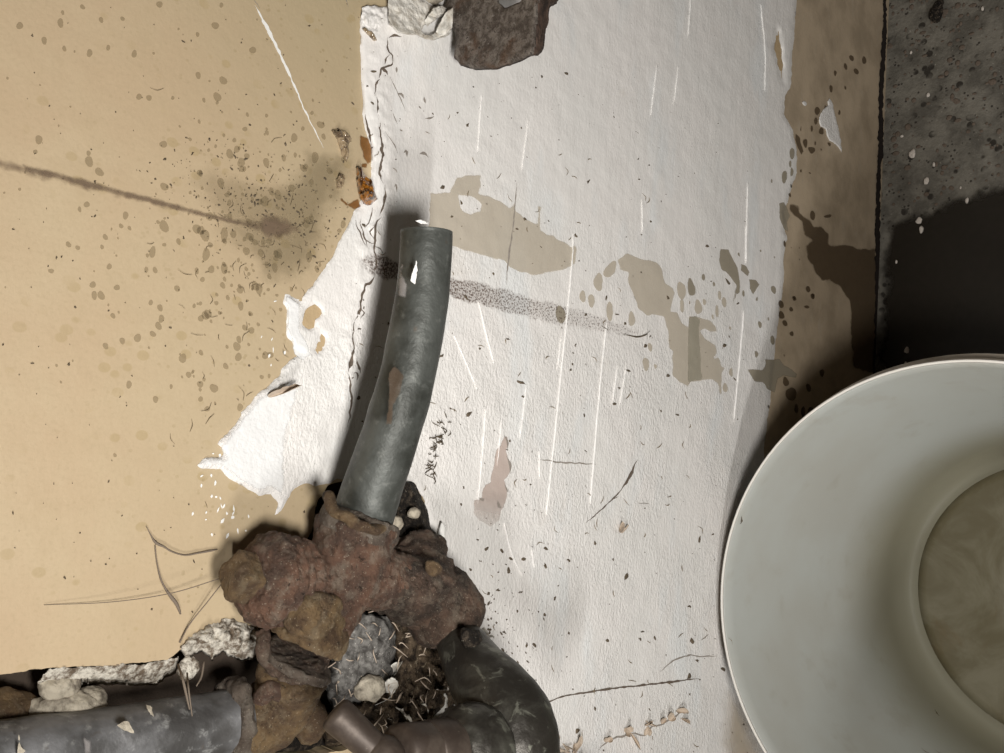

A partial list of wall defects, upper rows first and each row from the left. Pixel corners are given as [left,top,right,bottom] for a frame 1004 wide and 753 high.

peeling [361,0,453,40]
rust [360,136,371,167]
leakage [13,166,236,223]
crack [347,34,401,427]
leakage [429,176,576,275]
flaking render [261,297,325,366]
leakage [580,249,759,393]
leakage [748,351,814,417]
flaking render [192,383,302,538]
peeling [474,436,512,510]
rust [425,560,443,577]
spalling [0,618,277,706]